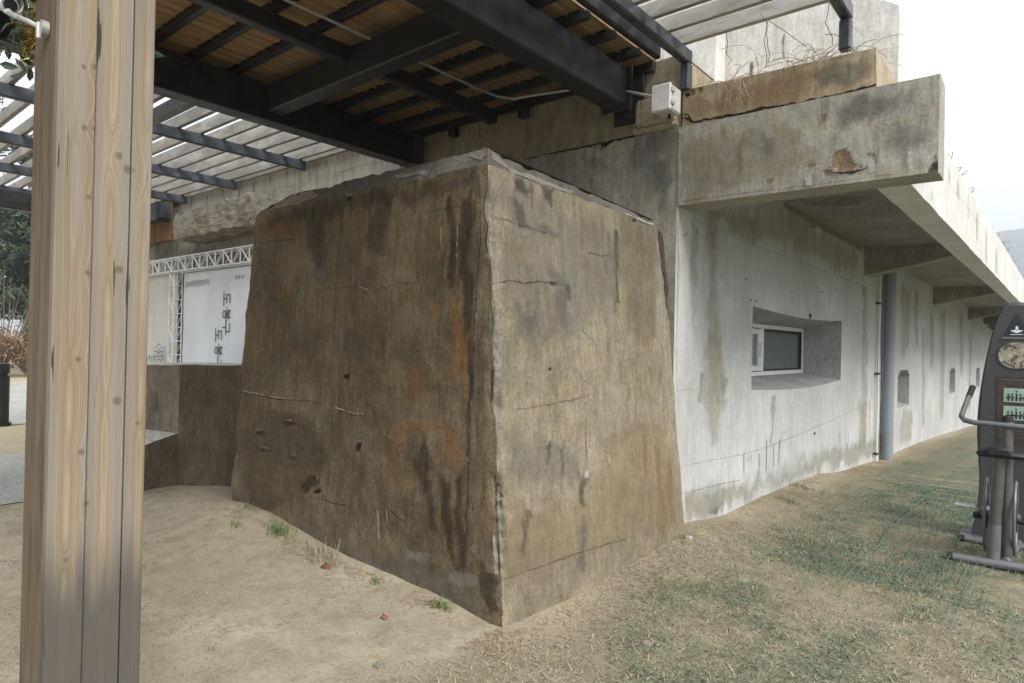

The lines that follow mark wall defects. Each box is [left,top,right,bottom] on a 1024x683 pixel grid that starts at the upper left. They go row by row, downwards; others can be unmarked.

crack [682,84,876,123]
crack [525,132,654,159]
spalling [805,150,878,185]
crack [423,177,566,576]
crack [513,393,591,475]
damp [365,453,471,605]
crack [506,539,625,579]